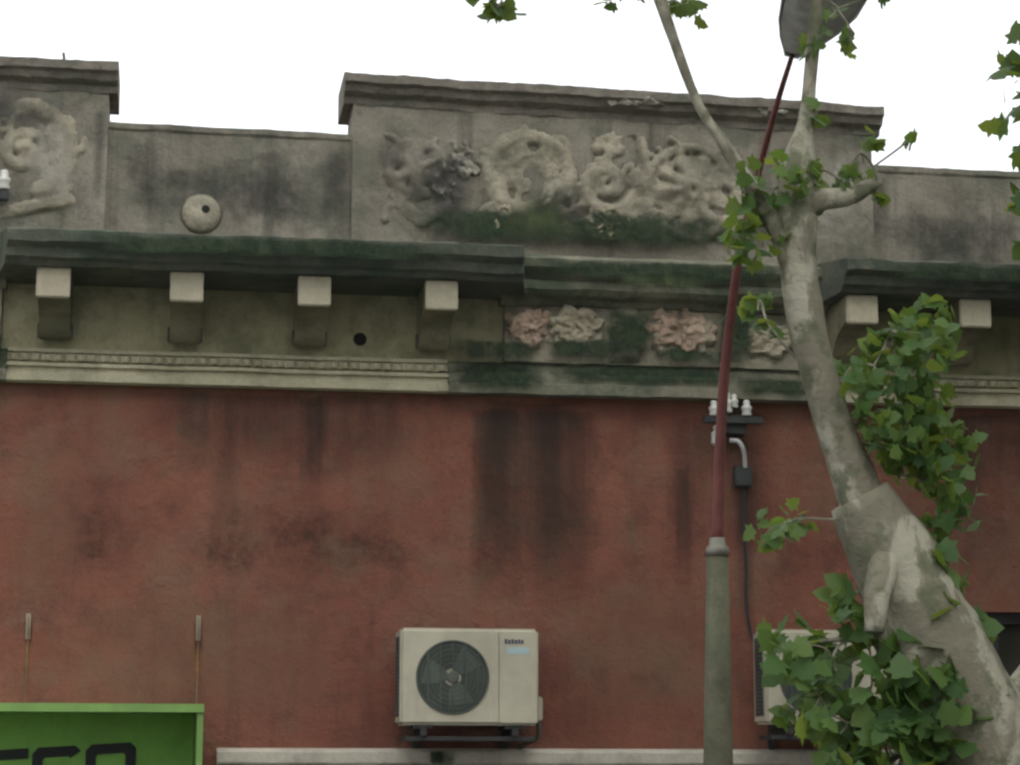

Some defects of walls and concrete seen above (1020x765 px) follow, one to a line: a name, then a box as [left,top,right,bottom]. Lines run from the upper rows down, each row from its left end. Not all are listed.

flaking render [504,304,605,350]
flaking render [645,307,718,352]